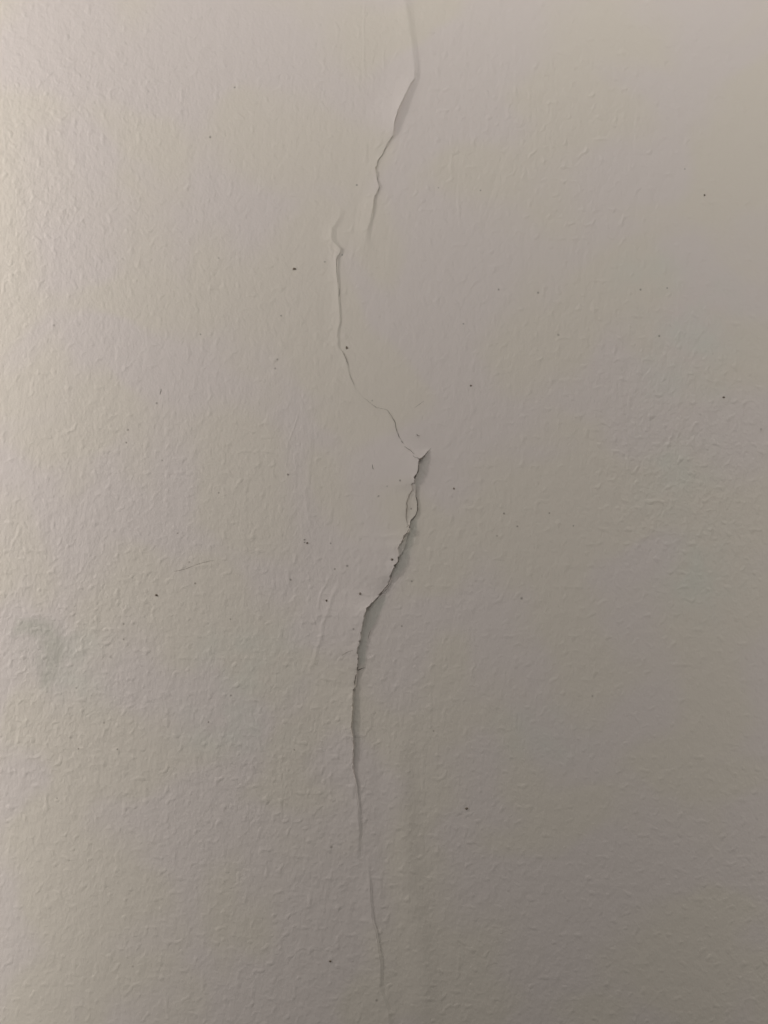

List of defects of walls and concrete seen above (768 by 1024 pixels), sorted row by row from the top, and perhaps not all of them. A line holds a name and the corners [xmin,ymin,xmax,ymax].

peeling [280,401,431,873]